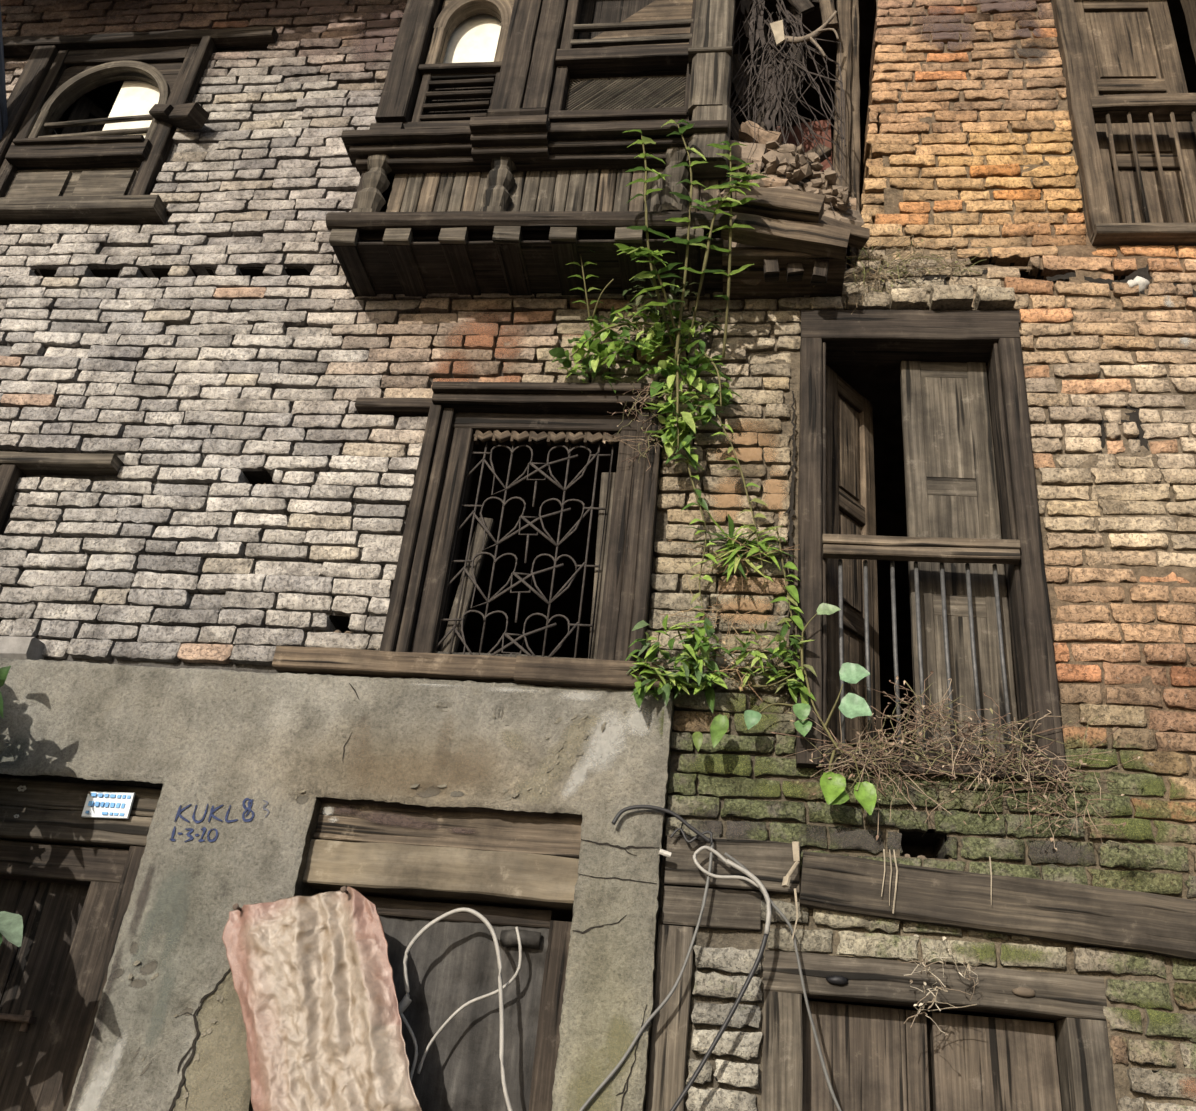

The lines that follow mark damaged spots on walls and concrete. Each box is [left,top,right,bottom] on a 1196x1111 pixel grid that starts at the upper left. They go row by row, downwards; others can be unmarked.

crack [580,839,659,884]
water stain [698,811,751,837]
water stain [808,824,903,855]
water stain [1022,841,1092,864]
crack [572,915,626,934]
crack [169,968,231,1111]
crack [616,1005,647,1111]